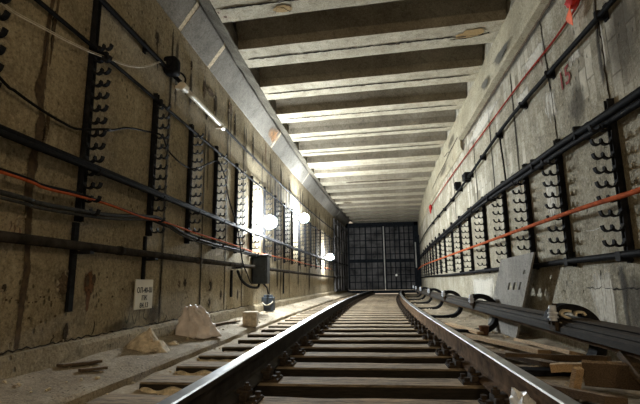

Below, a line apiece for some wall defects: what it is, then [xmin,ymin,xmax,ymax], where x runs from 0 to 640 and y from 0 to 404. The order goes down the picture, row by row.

leakage [35,0,60,142]
spalling [450,28,489,40]
leakage [24,149,38,235]
leakage [14,245,31,350]
rust [84,270,96,311]